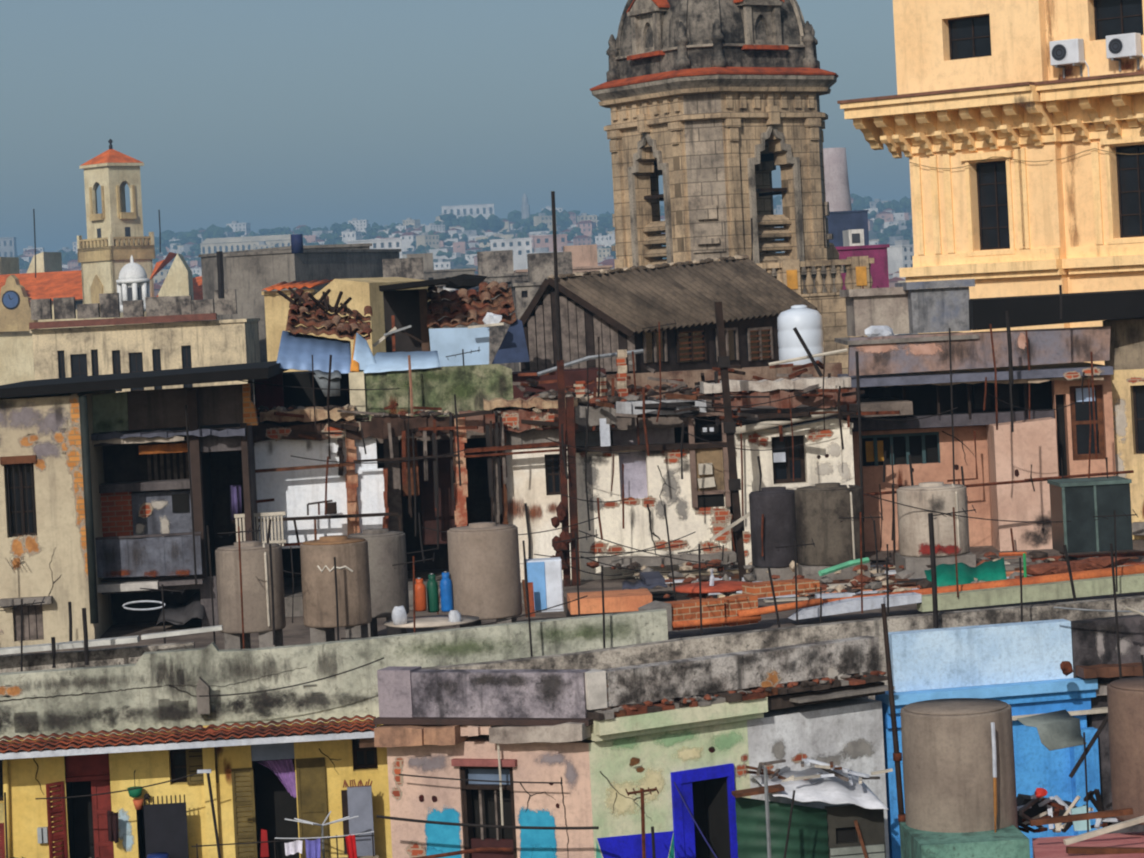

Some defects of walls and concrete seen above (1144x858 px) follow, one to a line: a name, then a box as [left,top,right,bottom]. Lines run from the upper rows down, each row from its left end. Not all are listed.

flaking render [0,393,88,579]
flaking render [579,449,751,558]
water stain [53,679,111,687]
water stain [157,663,185,692]
water stain [0,689,366,732]
water stain [699,684,720,696]
water stain [843,647,878,671]
peeling [606,738,664,815]